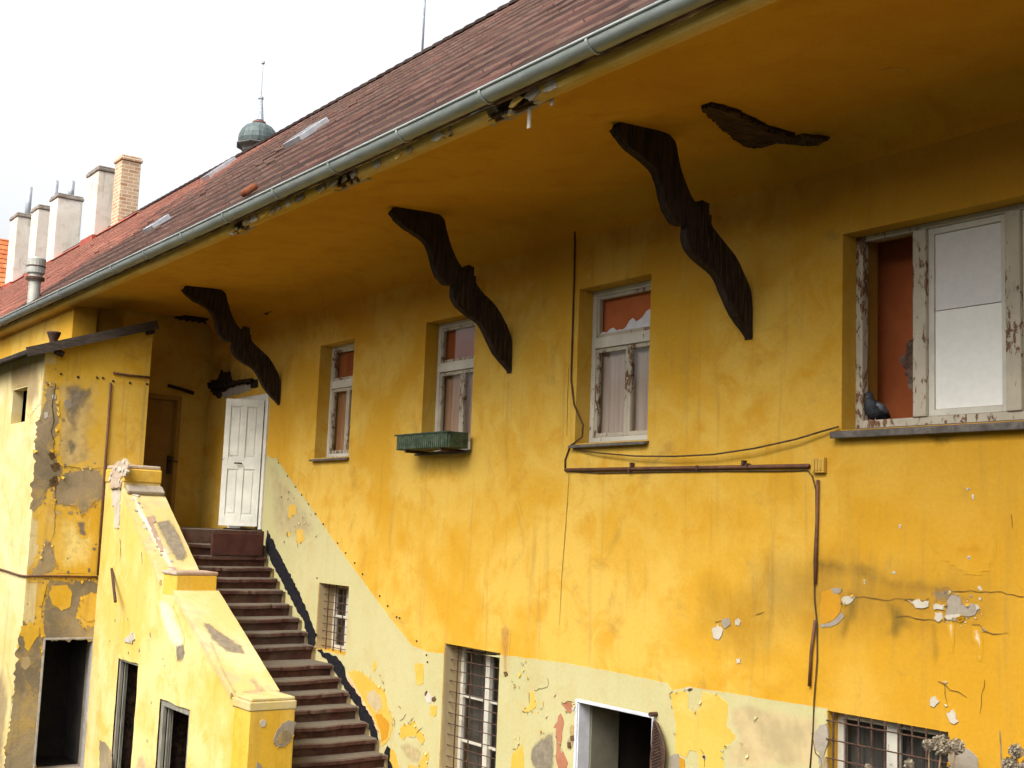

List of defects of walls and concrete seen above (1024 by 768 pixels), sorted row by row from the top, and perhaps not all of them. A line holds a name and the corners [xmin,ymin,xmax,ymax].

peeling [280,492,317,548]
peeling [3,363,184,768]
flaking render [712,618,741,640]
peeling [819,588,855,628]
crack [855,590,1024,624]
flaking render [908,586,983,661]
flaking render [260,719,296,749]
peeling [346,660,429,768]
peeling [511,659,576,768]
peeling [665,677,736,768]
crack [938,680,985,711]